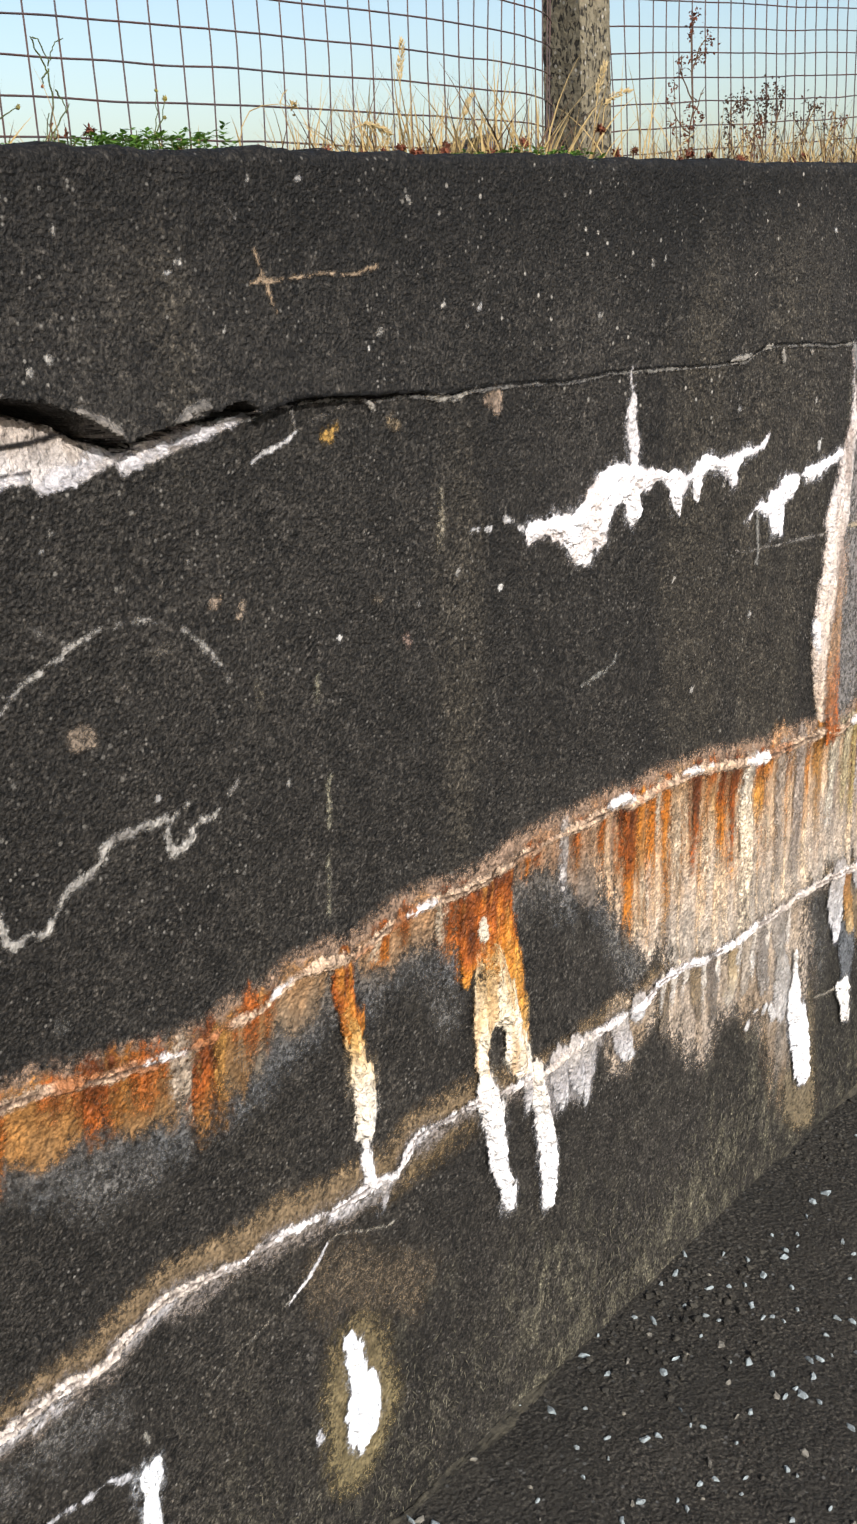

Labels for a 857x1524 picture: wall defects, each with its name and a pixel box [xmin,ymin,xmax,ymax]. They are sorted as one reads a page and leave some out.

crack [0,630,99,716]
spalling [0,394,243,494]
crack [188,339,857,465]
water stain [471,366,770,567]
water stain [749,338,857,745]
rust [0,881,469,1209]
water stain [332,945,378,1189]
crack [0,698,857,1116]
crack [0,853,857,1459]
water stain [378,868,559,1211]
rust [511,710,857,982]
water stain [598,858,857,1130]